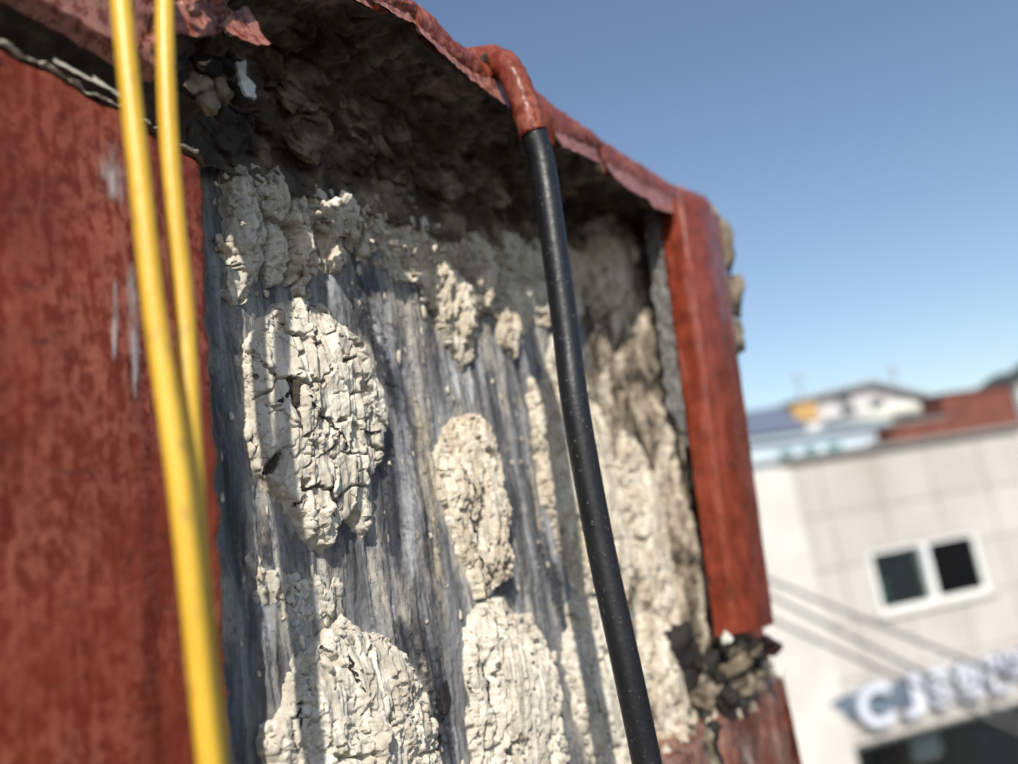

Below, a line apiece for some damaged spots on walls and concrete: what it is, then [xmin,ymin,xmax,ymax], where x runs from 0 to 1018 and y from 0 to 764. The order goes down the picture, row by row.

peeling [174,0,329,167]
peeling [353,0,512,110]
peeling [553,129,685,214]
crack [247,342,385,516]
spalling [660,620,783,717]